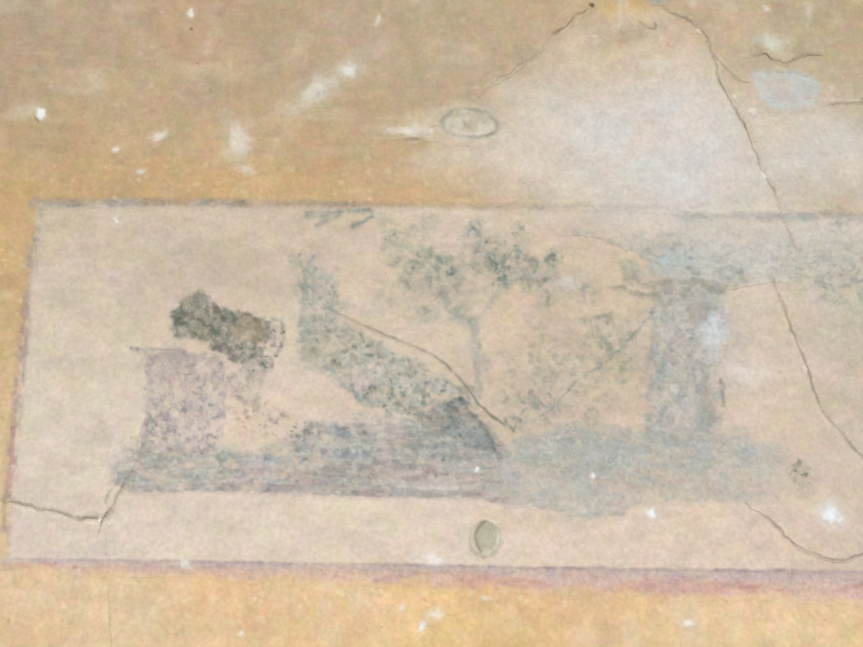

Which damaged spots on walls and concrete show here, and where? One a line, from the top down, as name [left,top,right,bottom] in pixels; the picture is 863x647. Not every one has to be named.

crack [478,5,591,97]
crack [664,9,863,460]
crack [0,458,139,557]
crack [745,501,863,563]